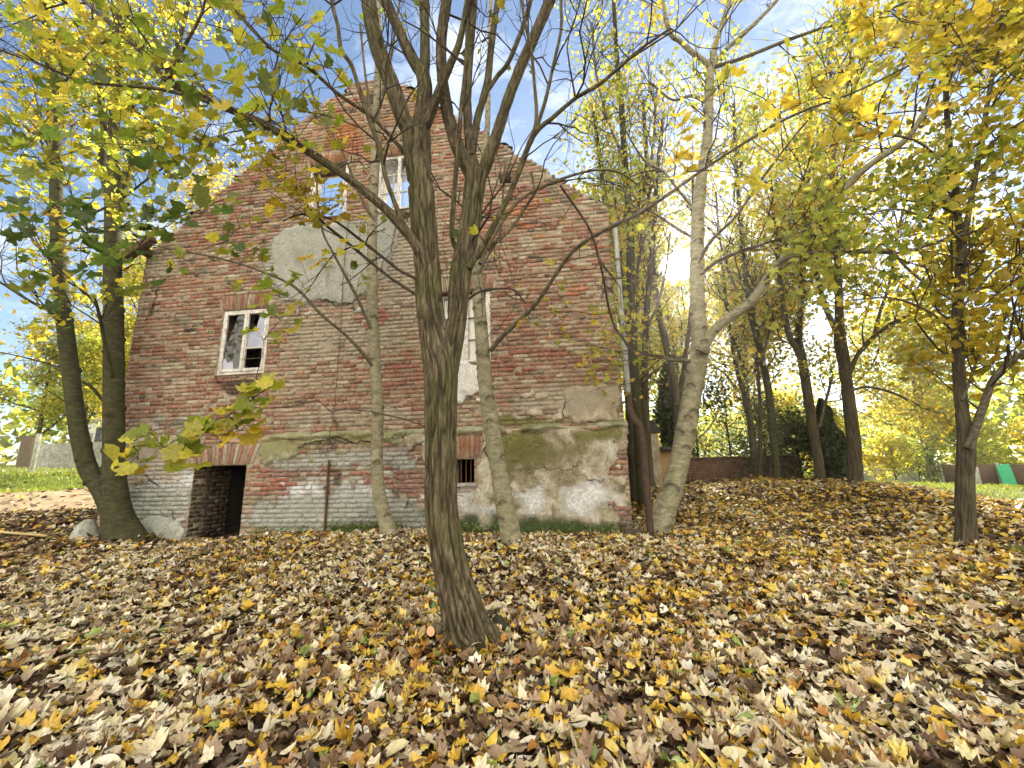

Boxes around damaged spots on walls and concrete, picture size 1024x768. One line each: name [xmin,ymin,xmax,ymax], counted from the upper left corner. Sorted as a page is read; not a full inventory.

flaking render [280,214,399,330]
spalling [384,429,425,500]
flaking render [457,432,497,532]
crack [518,453,619,486]
flaking render [509,383,631,529]